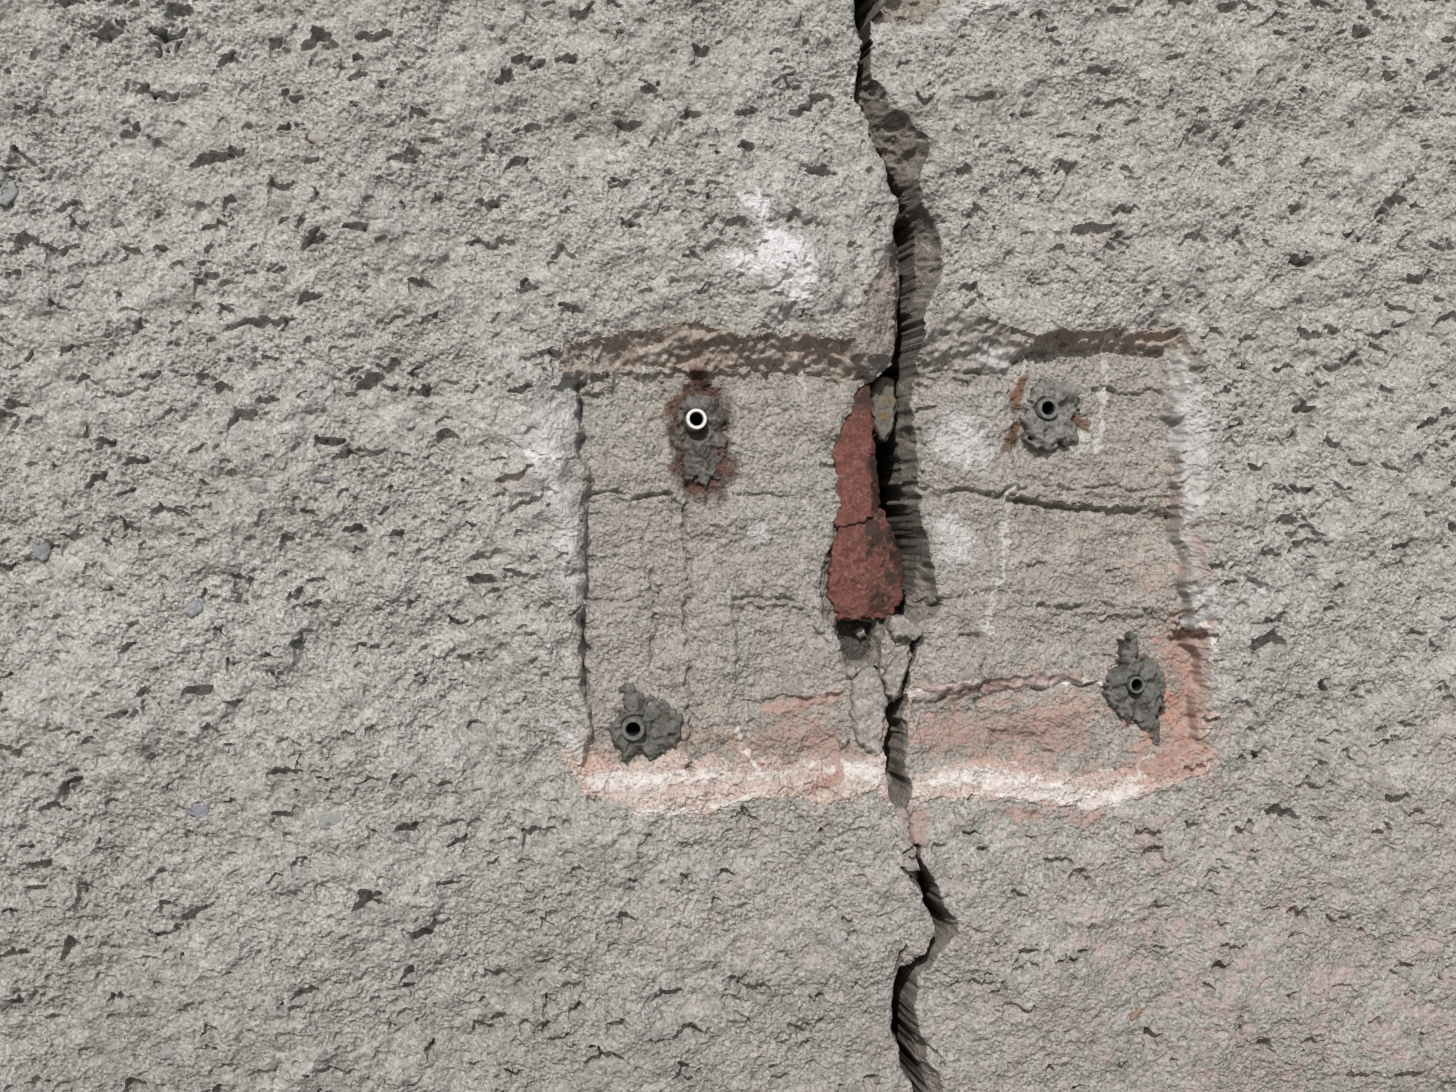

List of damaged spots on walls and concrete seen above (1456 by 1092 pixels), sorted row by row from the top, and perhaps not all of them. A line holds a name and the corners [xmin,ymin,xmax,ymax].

crack [575,382,589,444]
crack [572,485,799,771]
spalling [545,305,1221,816]
crack [732,0,1195,1092]